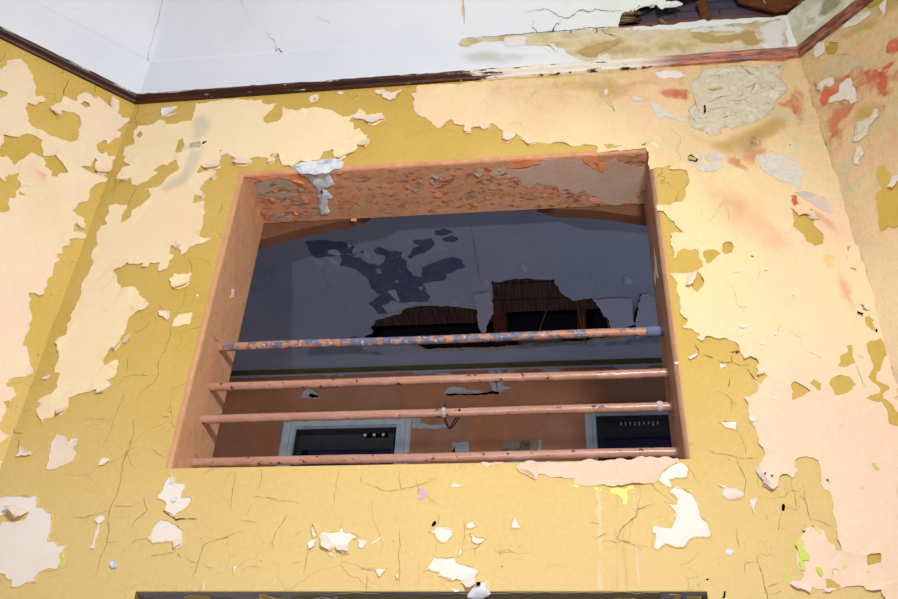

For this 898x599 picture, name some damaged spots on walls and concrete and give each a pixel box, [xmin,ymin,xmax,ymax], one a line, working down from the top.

crack [461,0,629,55]
leakage [577,40,620,57]
peeling [0,58,386,443]
peeling [305,228,465,314]
peeling [375,0,898,599]
peeling [46,434,78,470]
crack [79,290,289,575]
peeling [0,494,67,589]
peeling [147,473,193,551]